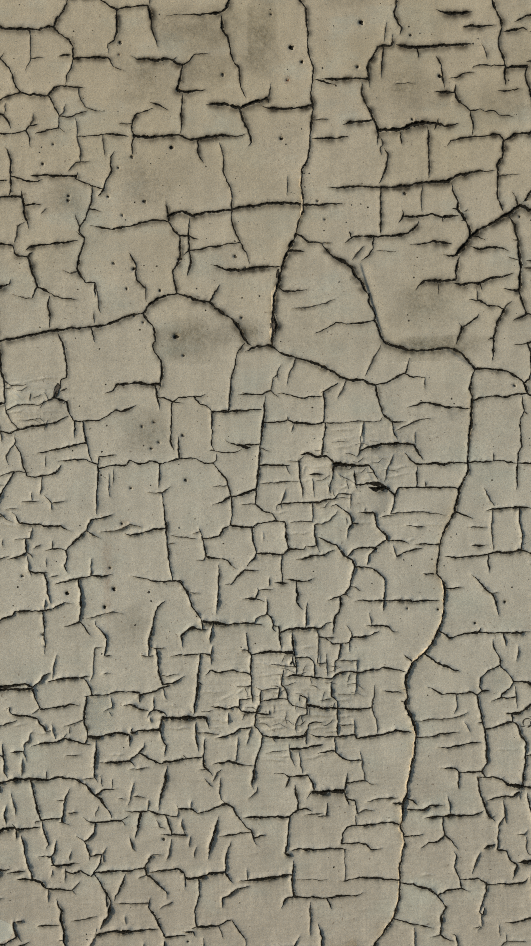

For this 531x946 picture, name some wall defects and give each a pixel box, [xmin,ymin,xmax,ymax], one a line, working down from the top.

crack [120,53,271,162]
crack [316,39,471,87]
crack [451,0,531,97]
crack [26,152,114,311]
crack [331,57,531,359]
crack [0,508,111,657]
crack [445,490,531,570]
crack [0,655,75,736]
crack [33,646,221,781]
crack [0,733,246,946]
crack [128,778,329,859]
crack [222,862,362,908]